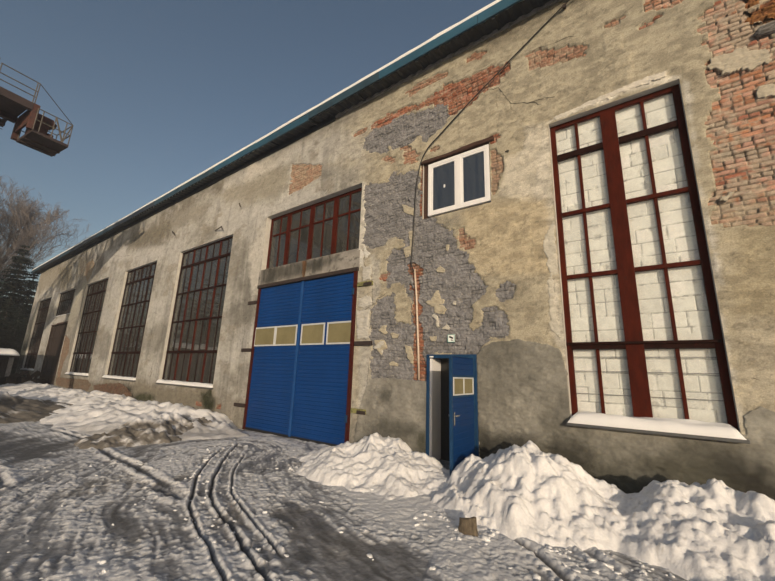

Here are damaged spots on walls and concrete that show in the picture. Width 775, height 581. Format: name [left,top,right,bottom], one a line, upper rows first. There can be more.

flaking render [639,0,683,30]
flaking render [525,44,588,71]
crack [493,87,551,133]
flaking render [697,0,775,228]
spalling [289,164,322,195]
peeling [354,61,517,381]
leakage [735,475,775,500]